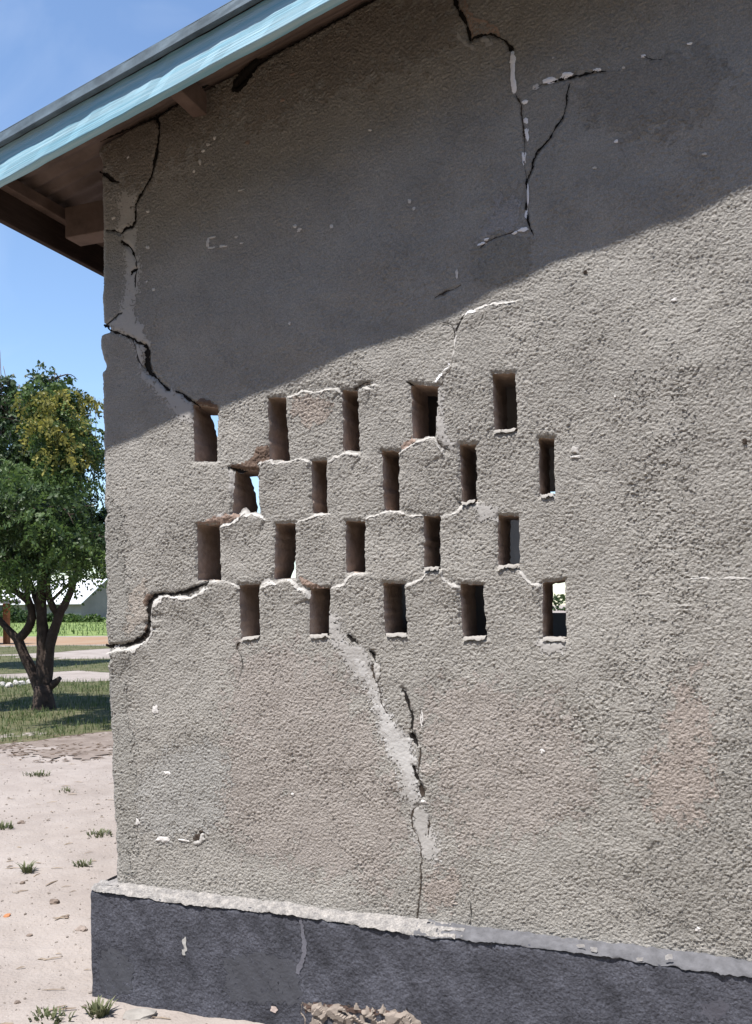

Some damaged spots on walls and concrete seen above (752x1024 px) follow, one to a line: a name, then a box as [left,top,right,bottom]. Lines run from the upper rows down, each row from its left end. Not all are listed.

crack [453,0,514,52]
crack [100,103,178,287]
crack [480,70,606,248]
crack [104,313,201,409]
crack [228,466,248,474]
crack [106,581,209,649]
crack [347,634,430,918]